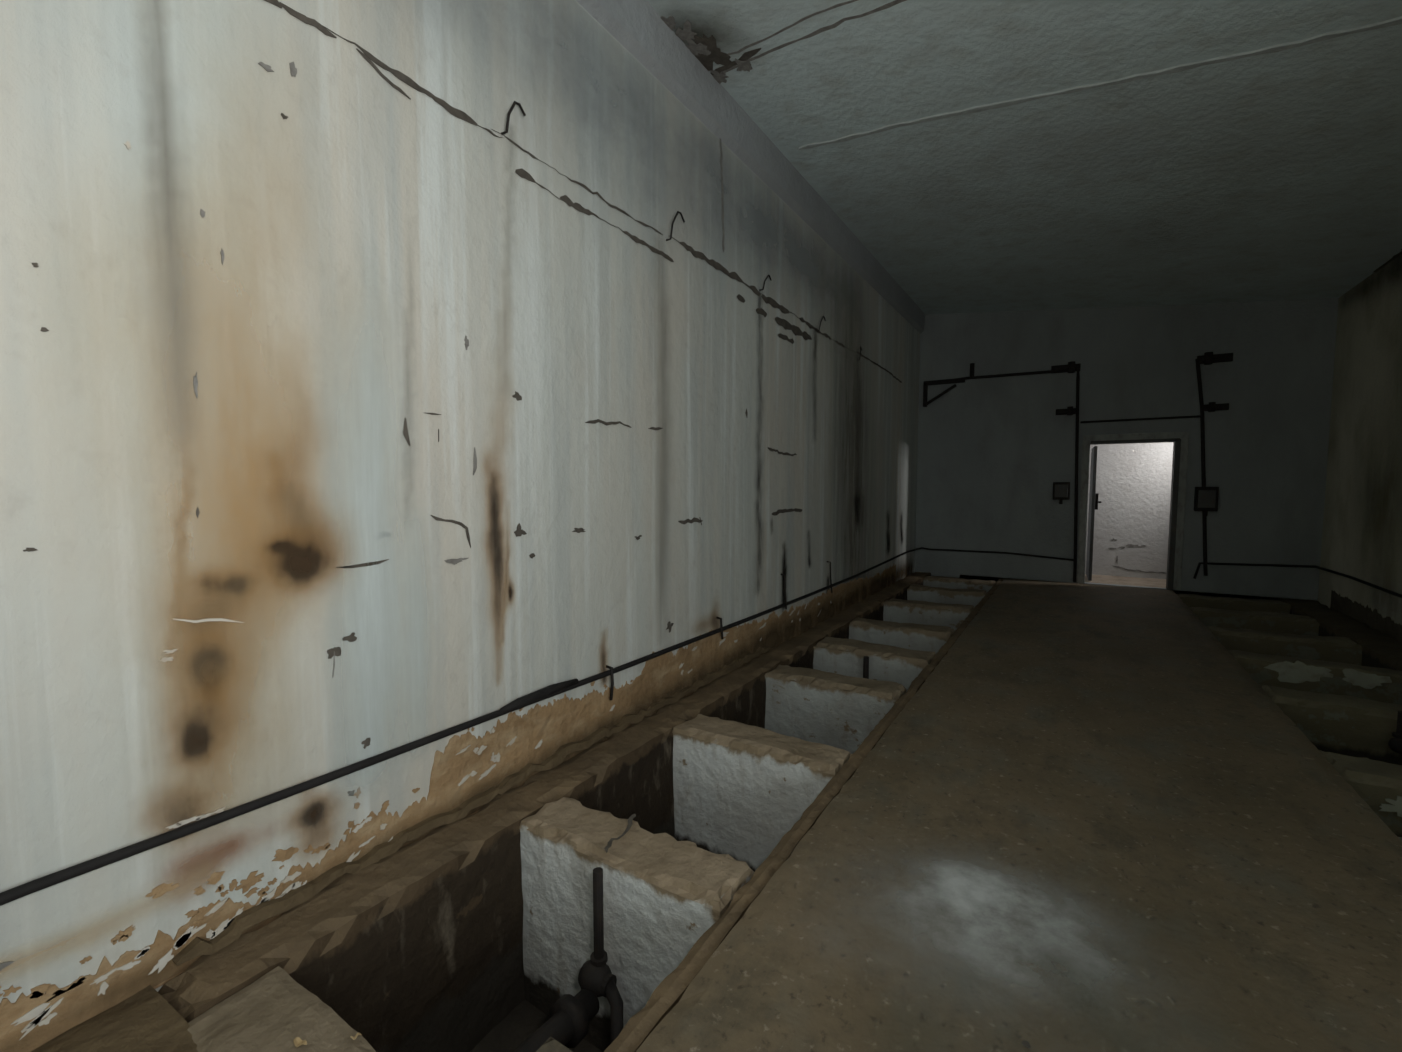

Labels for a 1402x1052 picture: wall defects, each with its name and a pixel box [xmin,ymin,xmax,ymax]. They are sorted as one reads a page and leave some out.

rust [174,295,334,764]
rust [488,472,513,627]
rust [161,793,201,830]
rust [297,799,330,845]
peeling [0,563,913,1052]
damp [905,863,1106,981]